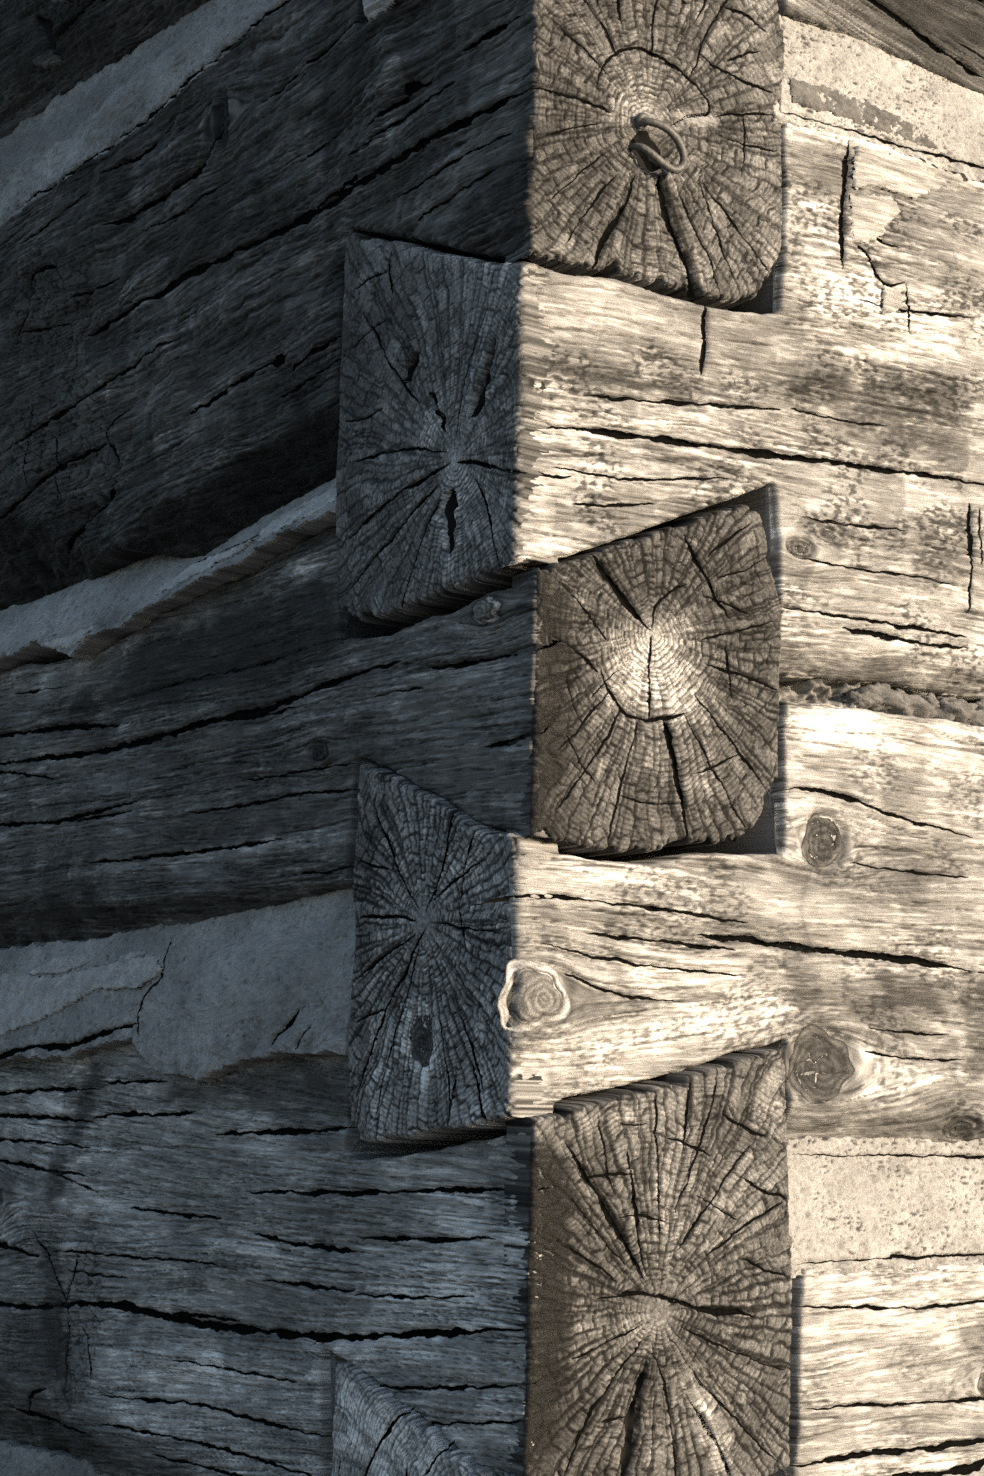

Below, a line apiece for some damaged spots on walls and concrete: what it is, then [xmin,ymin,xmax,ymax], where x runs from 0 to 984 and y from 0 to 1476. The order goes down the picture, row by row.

crack [0,0,984,609]
crack [0,522,973,841]
crack [0,763,984,1192]
crack [130,1206,221,1220]
crack [0,1233,539,1476]
crack [248,1186,505,1197]
crack [541,1069,984,1476]